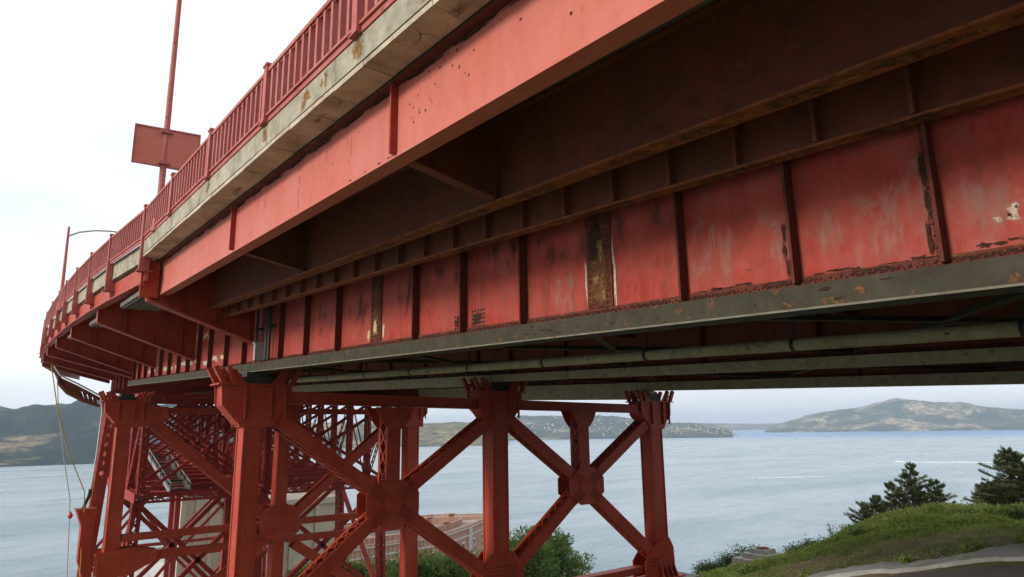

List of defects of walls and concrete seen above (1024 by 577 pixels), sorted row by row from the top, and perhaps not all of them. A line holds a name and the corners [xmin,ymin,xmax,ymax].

rust [689,150,937,313]
rust [950,236,1024,263]
peeling [993,201,1021,223]
rust [508,218,669,335]
rust [309,306,461,354]